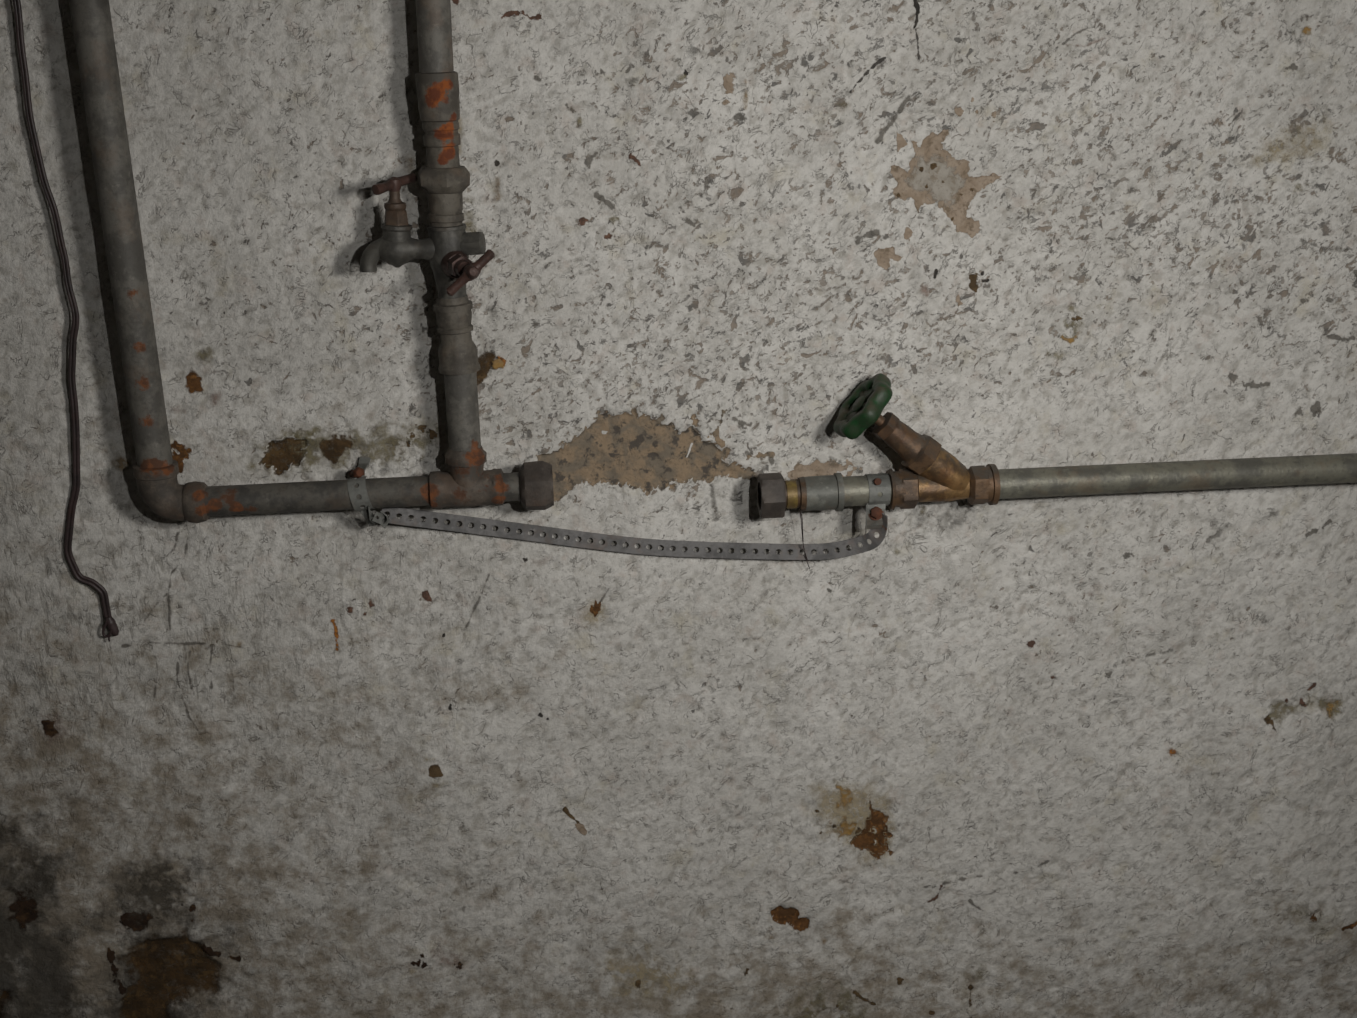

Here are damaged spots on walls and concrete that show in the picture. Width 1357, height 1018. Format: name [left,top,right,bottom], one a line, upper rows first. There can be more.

peeling [891,130,1002,238]
peeling [855,227,913,270]
spalling [250,424,439,475]
spalling [536,409,775,506]
peeling [788,450,862,481]
rust [815,785,894,859]
damp [0,828,55,928]